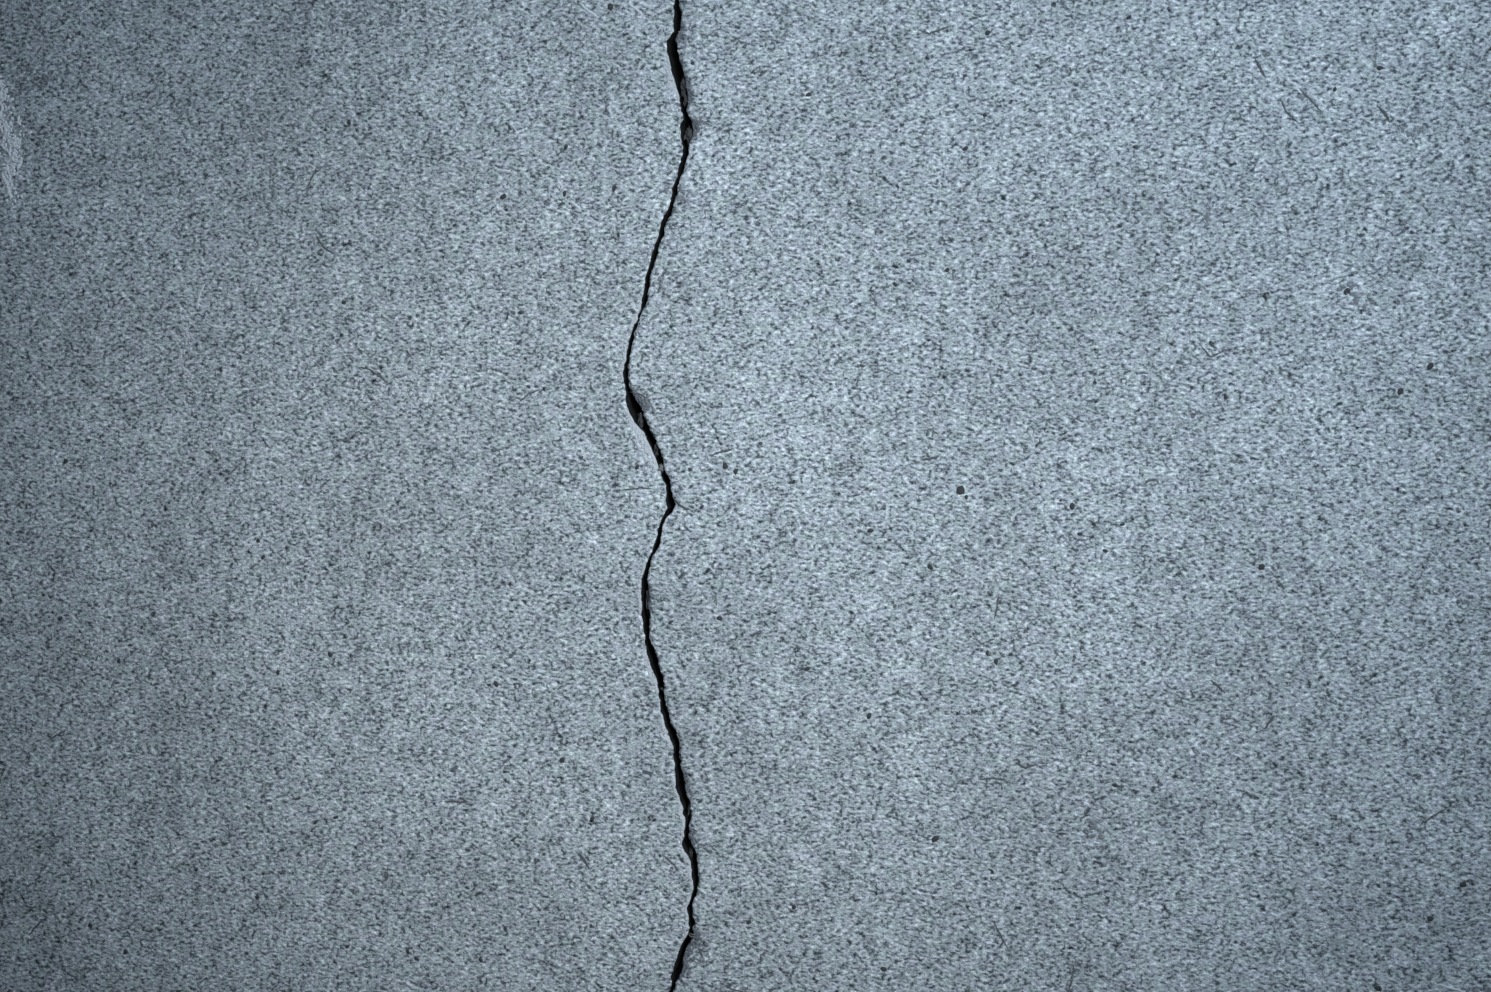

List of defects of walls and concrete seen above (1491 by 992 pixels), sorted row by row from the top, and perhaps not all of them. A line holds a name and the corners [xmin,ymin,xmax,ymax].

crack [618,0,744,992]